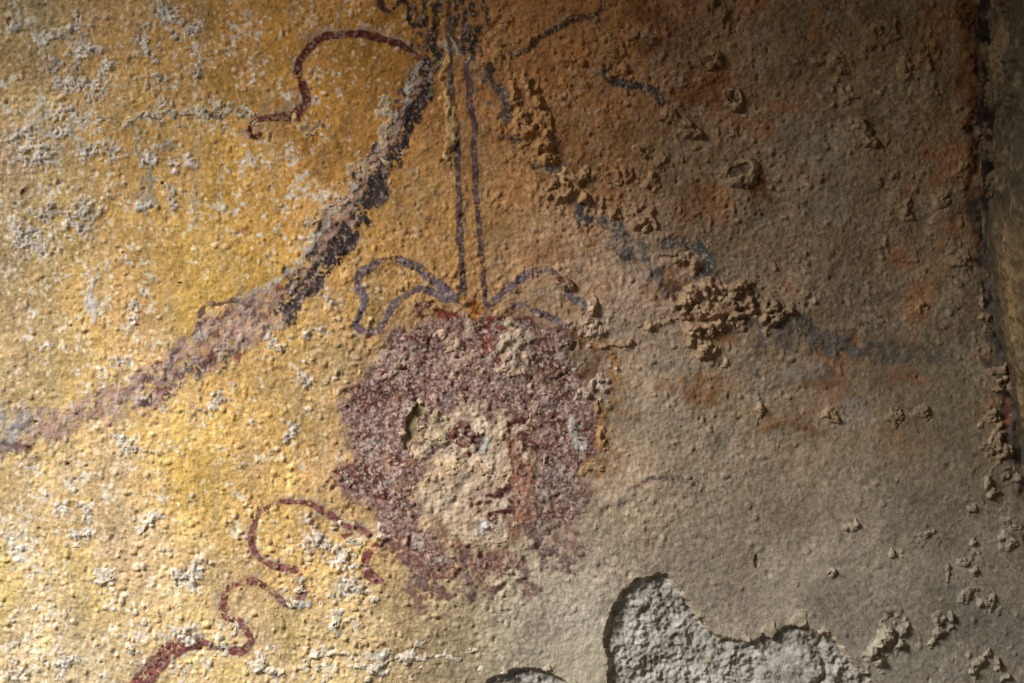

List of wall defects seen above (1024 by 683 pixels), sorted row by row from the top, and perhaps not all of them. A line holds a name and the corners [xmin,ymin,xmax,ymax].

spalling [398,398,429,452]
spalling [602,572,877,683]
spalling [485,662,568,683]